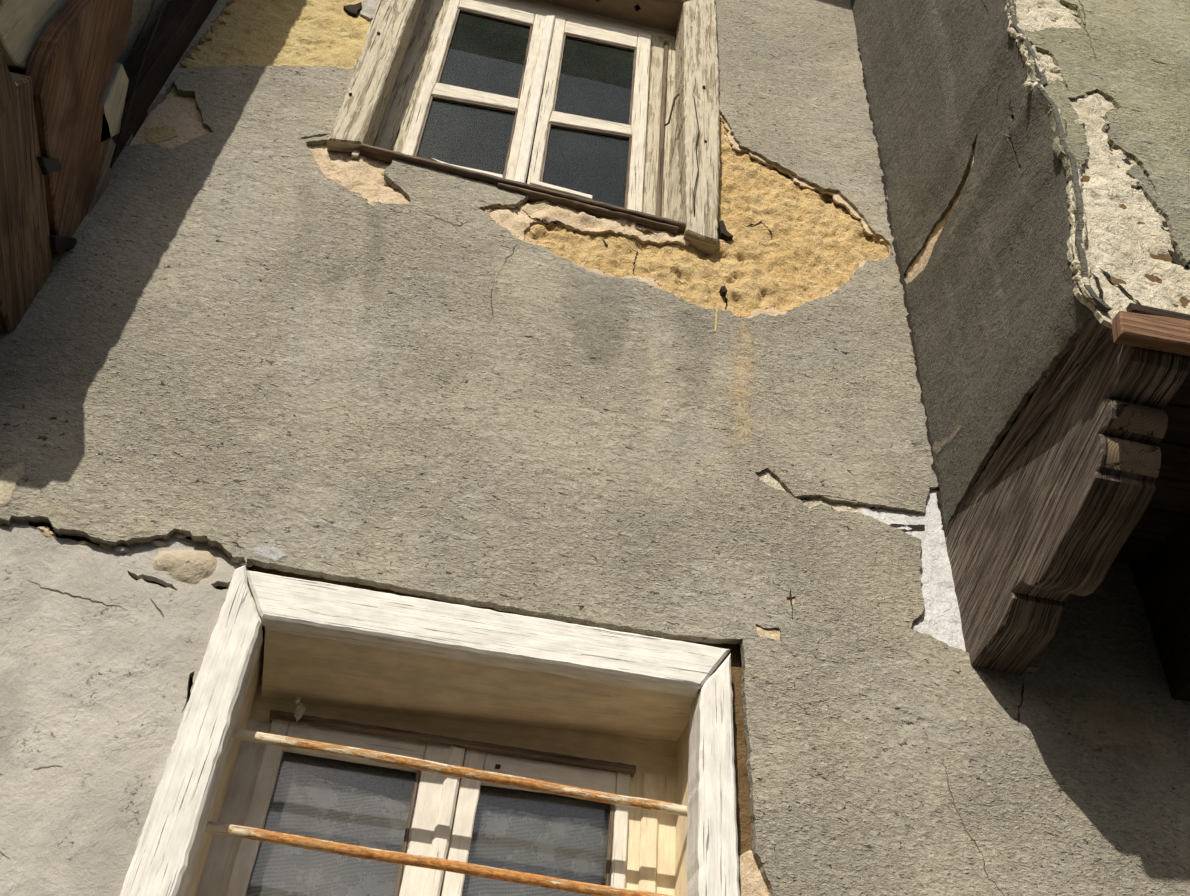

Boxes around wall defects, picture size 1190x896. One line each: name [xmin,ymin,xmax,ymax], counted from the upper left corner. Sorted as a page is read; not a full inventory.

flaking render [179,0,379,69]
flaking render [1003,0,1081,93]
flaking render [130,87,211,149]
flaking render [307,143,409,206]
flaking render [481,114,890,318]
flaking render [1066,92,1190,329]
crack [0,520,208,616]
crack [215,557,255,590]
crack [186,677,194,701]